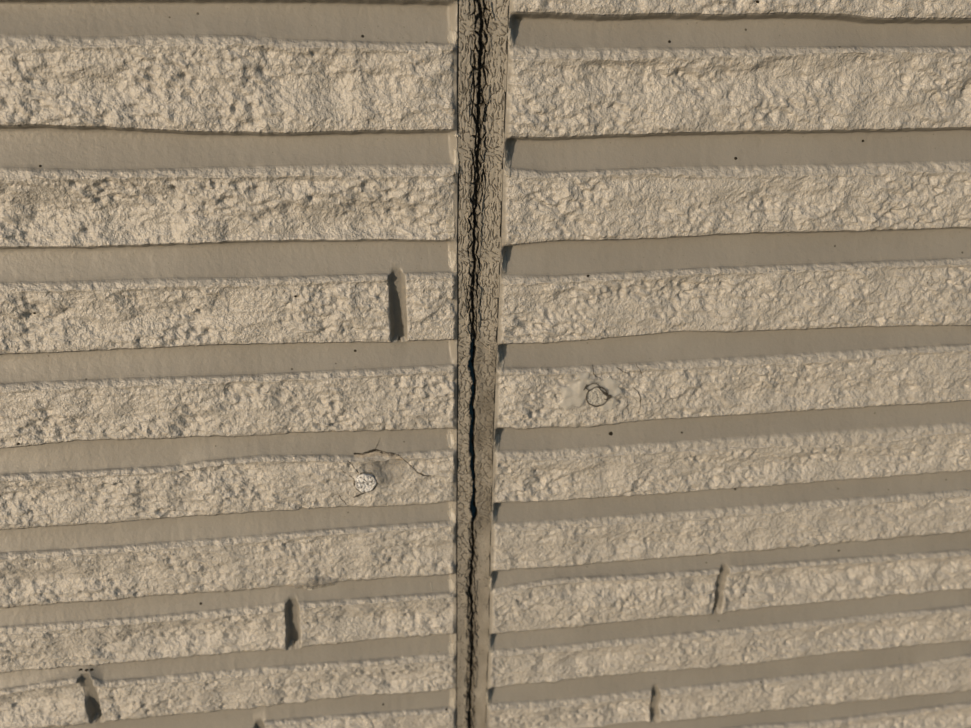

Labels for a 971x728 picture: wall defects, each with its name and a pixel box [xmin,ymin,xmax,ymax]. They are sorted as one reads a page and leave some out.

crack [456,0,509,728]